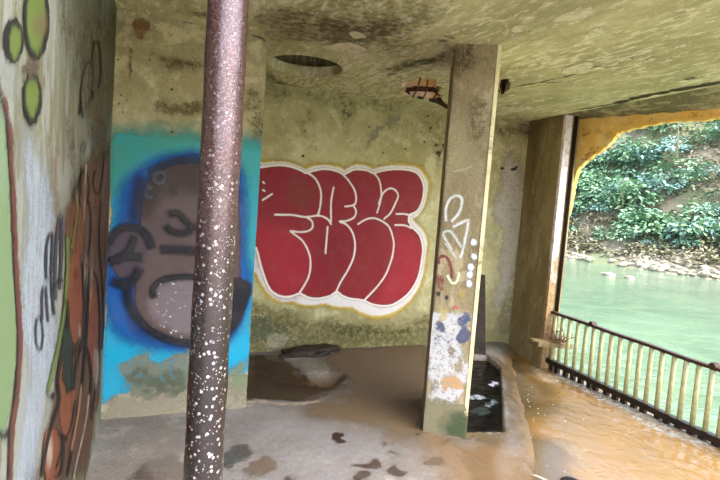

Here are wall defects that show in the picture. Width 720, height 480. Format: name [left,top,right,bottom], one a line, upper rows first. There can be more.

damp [64,0,207,150]
rust [132,18,151,39]
damp [247,0,436,64]
peeling [321,31,367,55]
spalling [378,62,452,109]
damp [387,54,445,75]